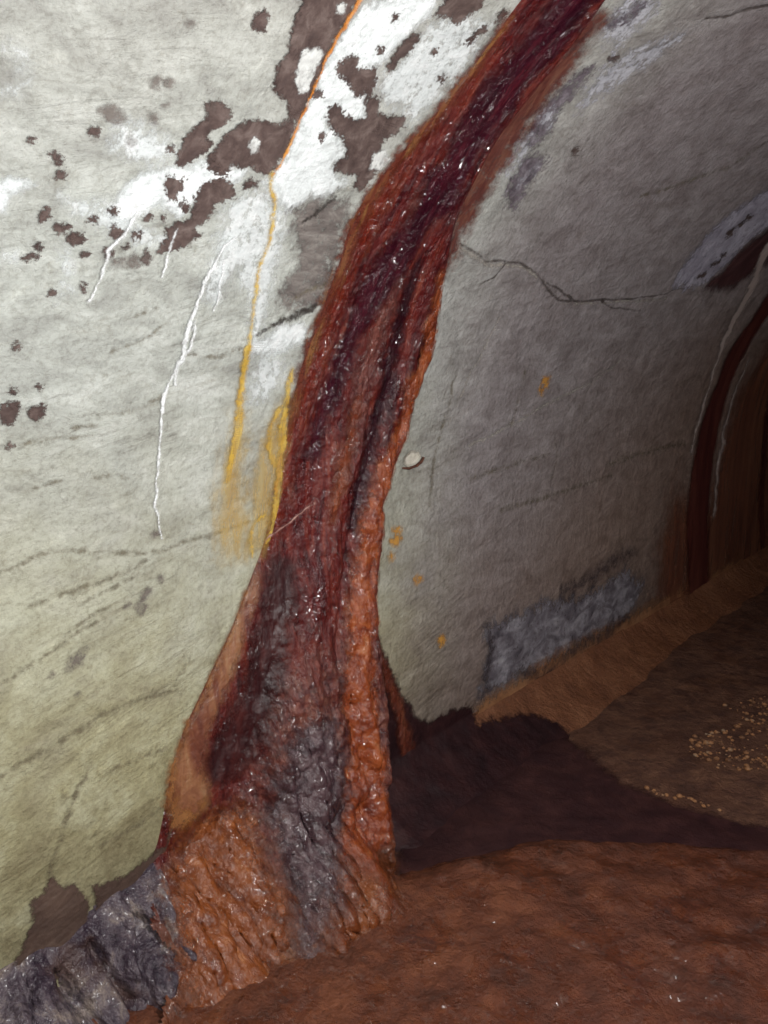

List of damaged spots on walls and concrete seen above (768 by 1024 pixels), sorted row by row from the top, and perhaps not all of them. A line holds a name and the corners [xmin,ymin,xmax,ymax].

peeling [20,241,44,264]
leakage [70,124,247,245]
peeling [39,0,422,269]
leakage [206,0,492,403]
crack [460,243,690,310]
corrosion [150,0,607,1024]
leakage [380,588,690,852]